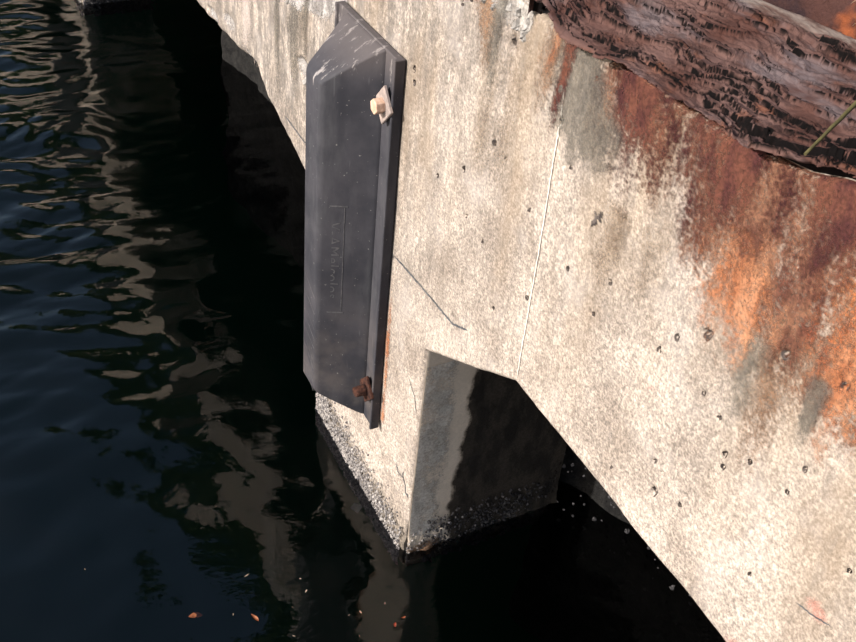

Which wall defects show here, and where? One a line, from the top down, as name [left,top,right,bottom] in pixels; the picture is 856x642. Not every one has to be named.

corrosion [594,60,856,446]